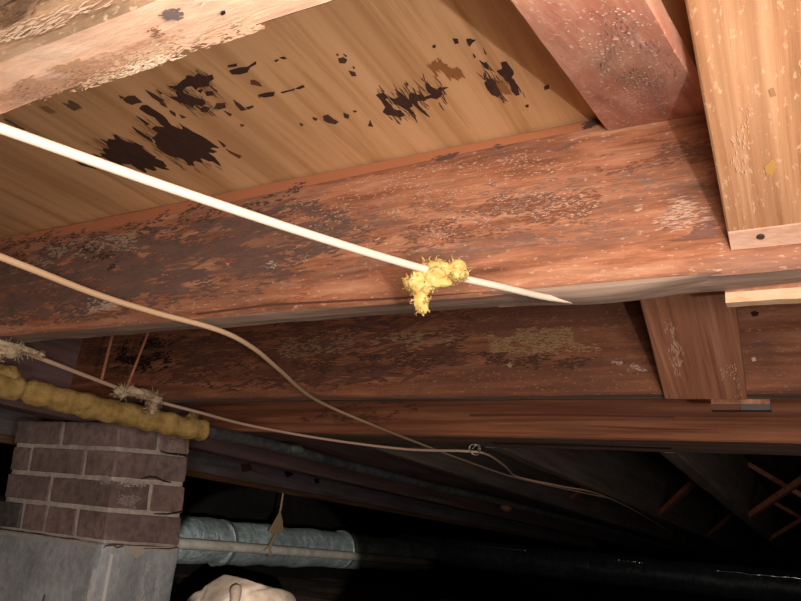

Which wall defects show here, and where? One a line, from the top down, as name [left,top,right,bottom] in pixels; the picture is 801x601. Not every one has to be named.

mould [0,0,124,42]
water stain [0,29,186,114]
water stain [84,66,254,175]
water stain [228,61,304,98]
water stain [313,110,357,124]
water stain [376,58,465,124]
water stain [453,38,529,108]
water stain [0,136,724,330]
water stain [79,301,638,393]